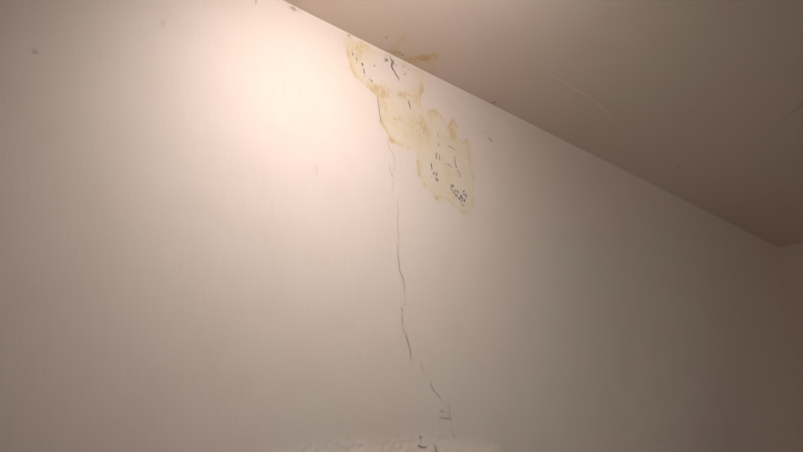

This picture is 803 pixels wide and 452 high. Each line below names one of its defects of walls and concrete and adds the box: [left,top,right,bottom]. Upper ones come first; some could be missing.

water stain [341,33,477,218]
crack [377,94,456,439]